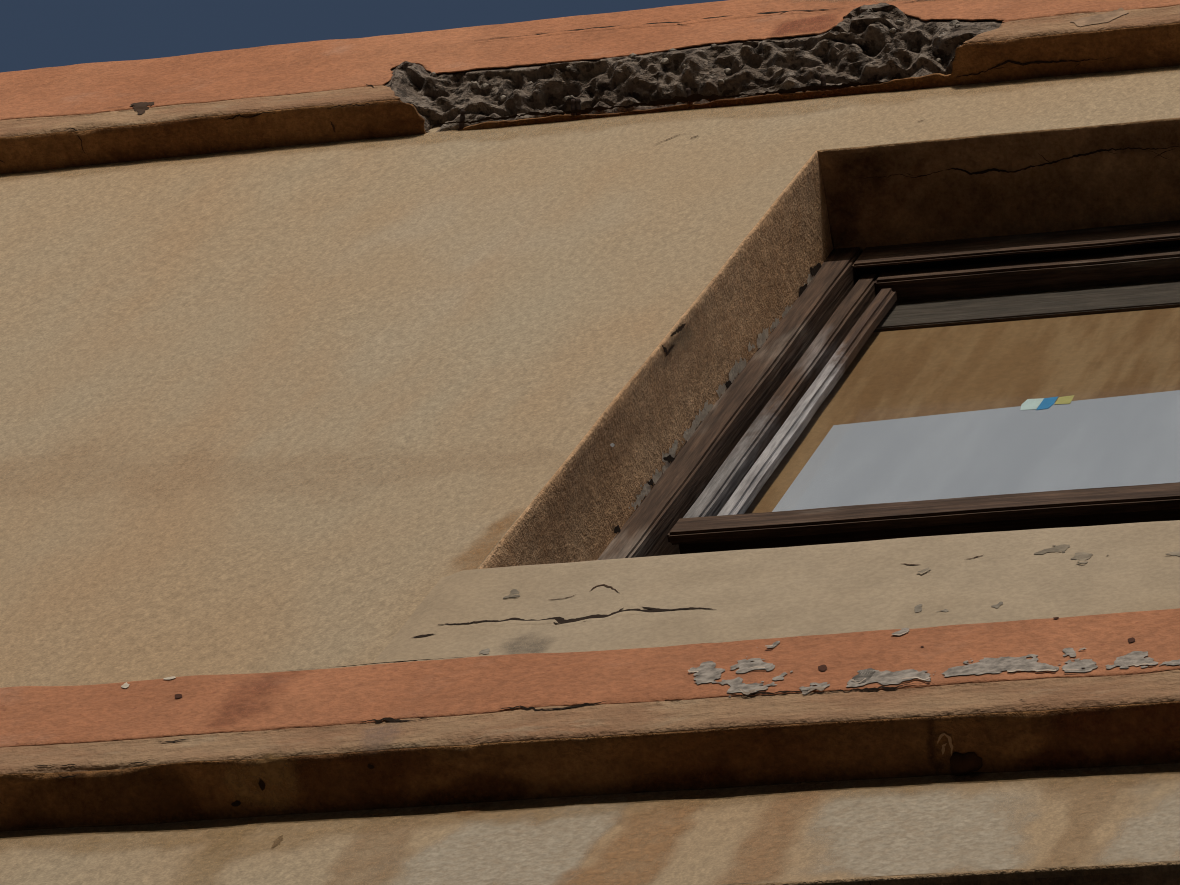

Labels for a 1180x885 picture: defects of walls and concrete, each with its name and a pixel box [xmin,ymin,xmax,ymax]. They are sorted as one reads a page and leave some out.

spalling [366,2,1003,133]
peeling [1034,544,1093,564]
crack [411,584,711,638]
crack [361,714,438,723]
crack [499,701,606,710]
peeling [688,641,793,697]
peeling [799,665,830,694]
crack [731,683,922,697]
peeling [846,637,1180,687]
leakage [400,775,702,885]
leakage [816,777,1022,876]
leakage [1104,797,1180,862]